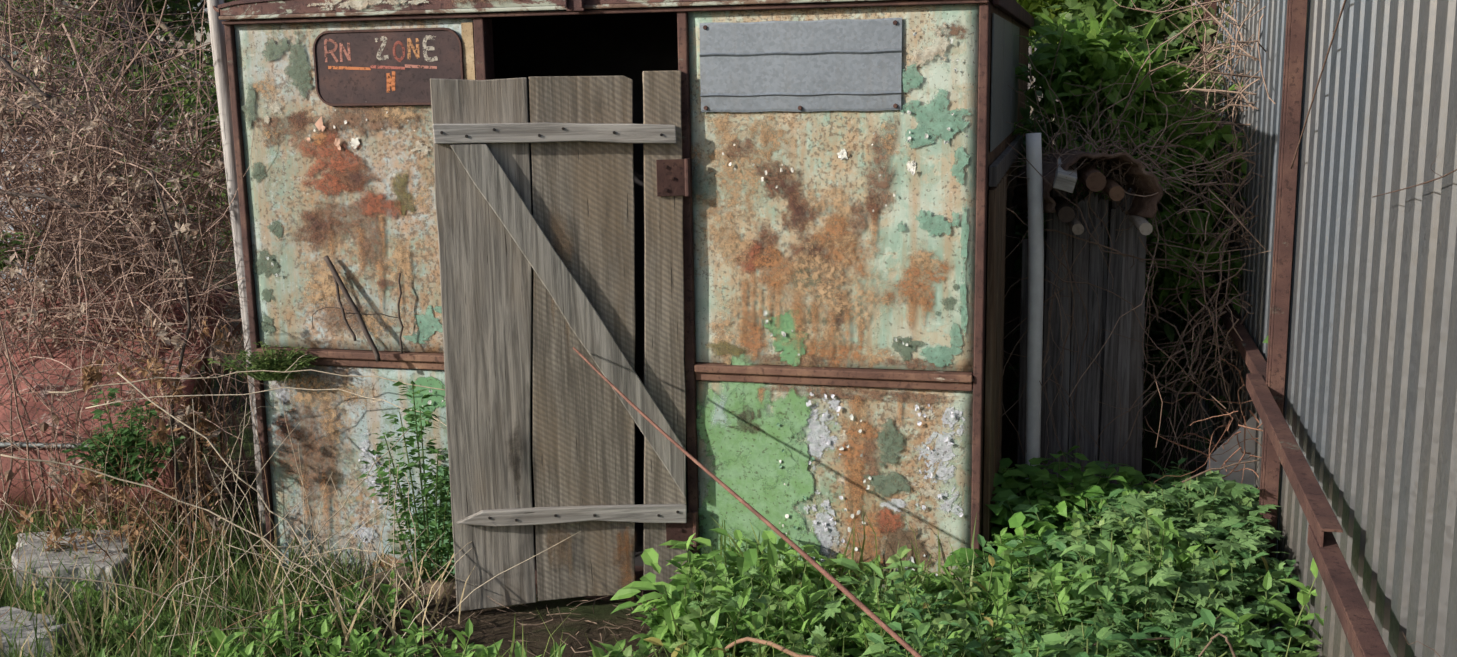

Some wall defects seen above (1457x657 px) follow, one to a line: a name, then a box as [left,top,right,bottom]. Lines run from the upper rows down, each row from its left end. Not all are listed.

corrosion [252,106,430,338]
corrosion [691,112,948,370]
peeling [696,354,966,592]
corrosion [759,384,947,577]